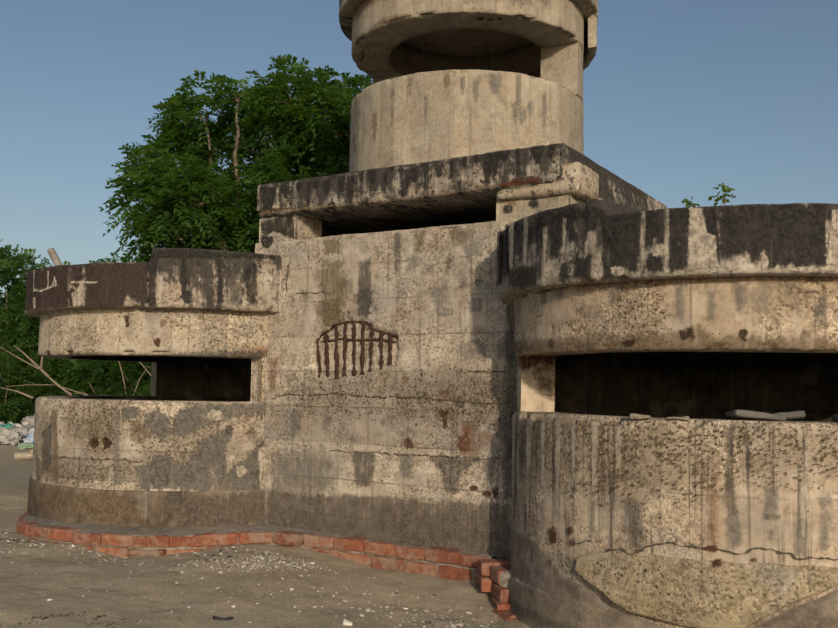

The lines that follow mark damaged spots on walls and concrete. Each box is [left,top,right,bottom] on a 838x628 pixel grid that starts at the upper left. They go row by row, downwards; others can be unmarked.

damp [400,148,521,196]
damp [532,143,556,164]
damp [147,169,387,306]
damp [316,239,371,326]
damp [496,198,615,307]
damp [31,411,141,523]
damp [159,300,838,559]
corrosion [547,526,557,544]
flaking render [510,528,670,628]
crack [575,540,838,561]
flaking render [750,588,838,628]